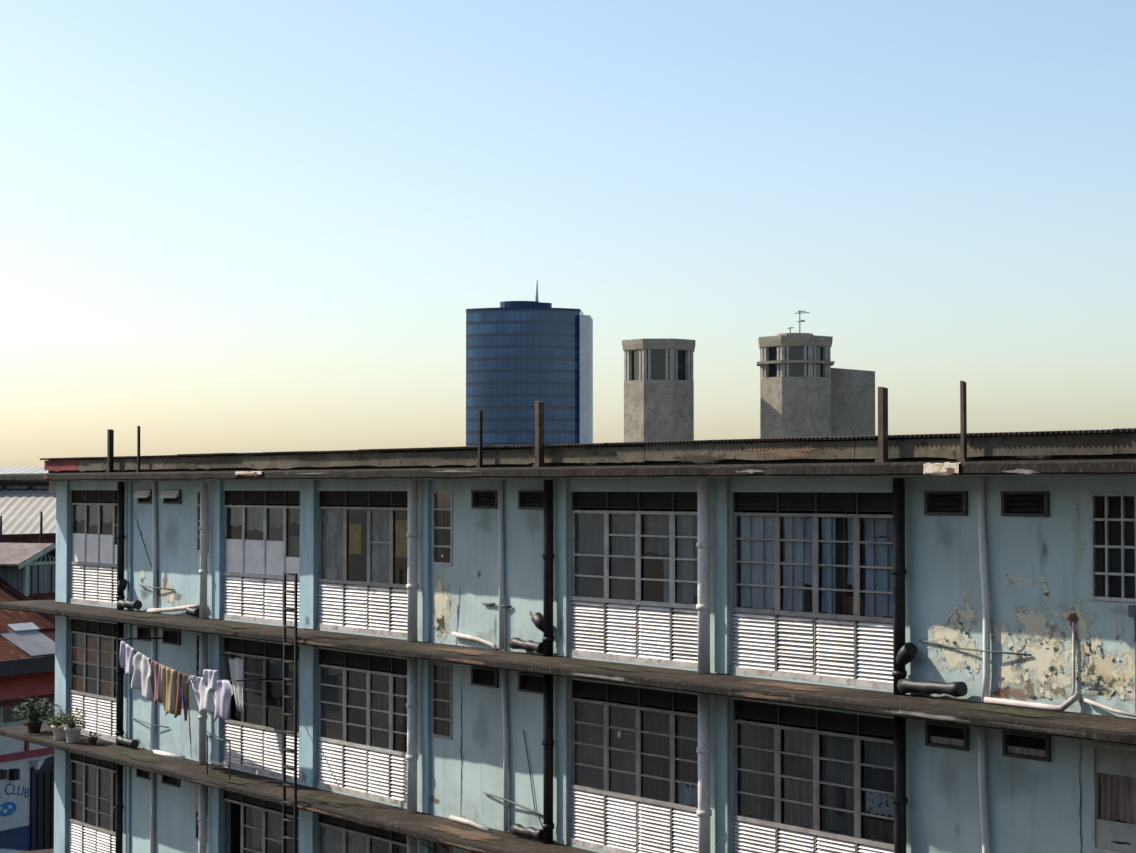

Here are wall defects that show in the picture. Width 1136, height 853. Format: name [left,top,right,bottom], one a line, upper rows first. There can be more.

peeling [157,581,193,607]
peeling [431,554,455,642]
peeling [926,575,1135,709]
corrosion [1067,612,1078,648]
crack [1076,739,1084,853]